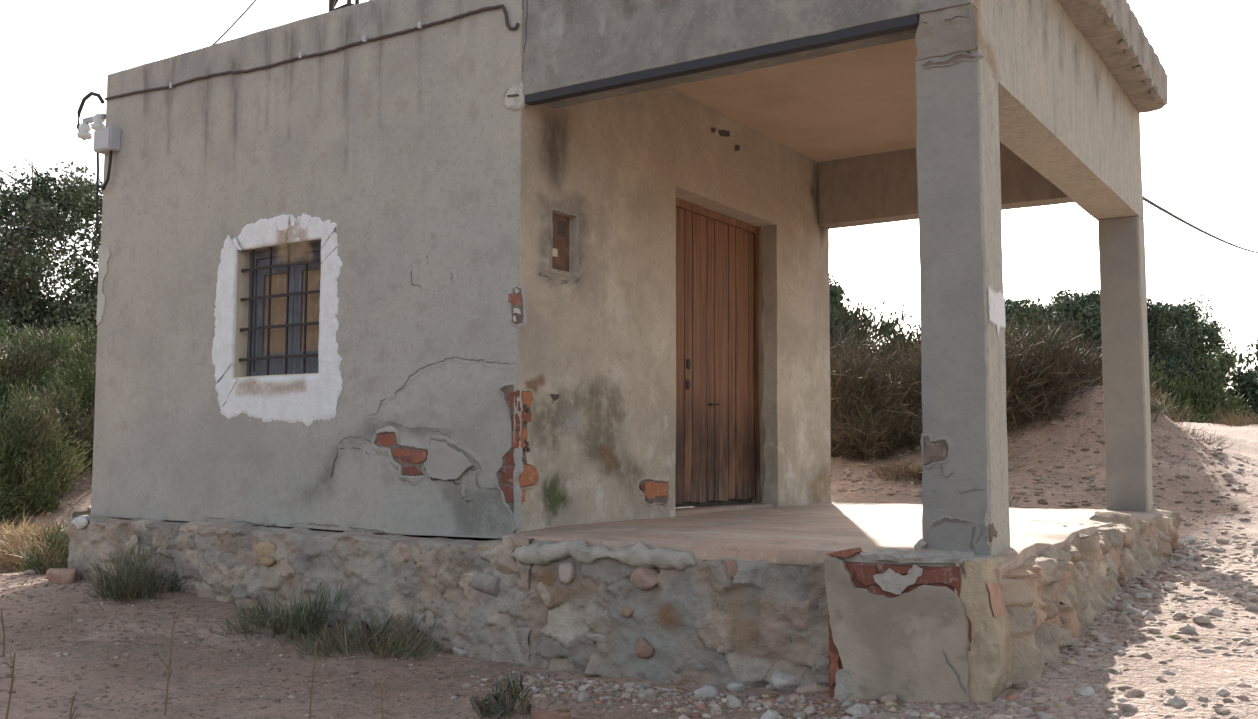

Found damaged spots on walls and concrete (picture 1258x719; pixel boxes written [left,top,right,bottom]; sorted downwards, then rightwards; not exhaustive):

spalling [507,285,527,329]
crack [331,356,517,479]
flaking render [370,425,476,487]
spalling [494,381,560,534]
flaking render [920,433,955,471]
flaking render [636,476,670,507]
flaking render [826,547,961,596]
flaking render [829,650,855,701]